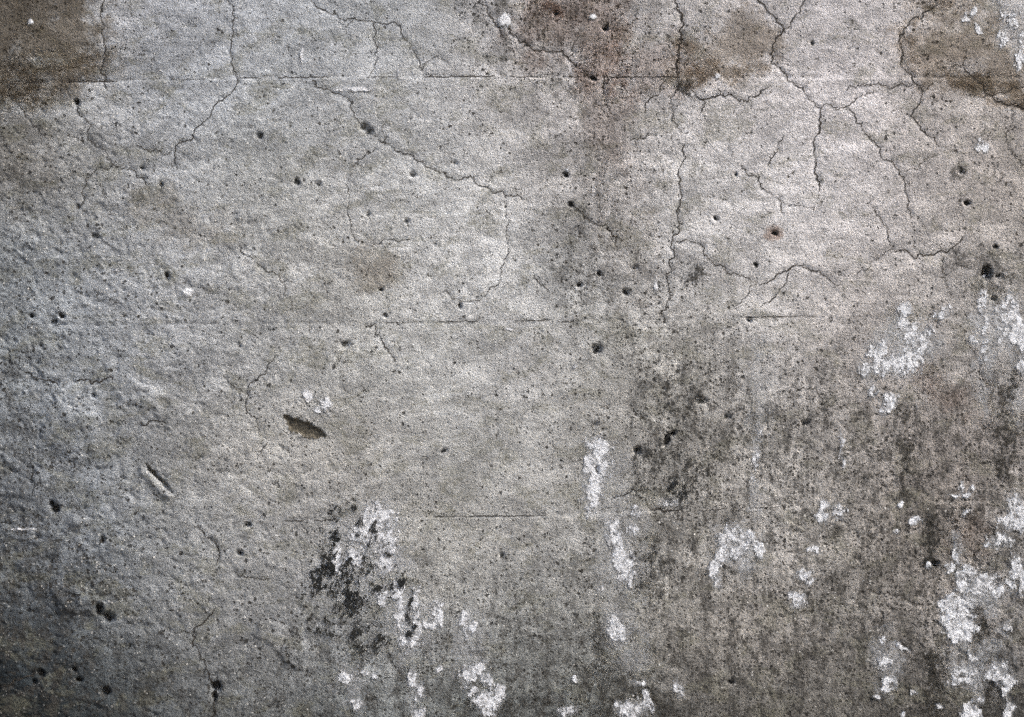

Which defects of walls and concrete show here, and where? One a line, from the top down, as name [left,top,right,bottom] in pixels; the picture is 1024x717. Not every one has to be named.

crack [311,0,445,74]
crack [77,0,239,207]
crack [312,80,523,302]
crack [479,0,1024,323]
crack [239,245,293,309]
spalling [283,387,334,439]
water stain [633,437,716,513]
water stain [895,405,915,497]
water stain [990,382,1017,482]
water stain [302,499,417,661]
water stain [626,535,676,597]
water stain [917,649,950,717]